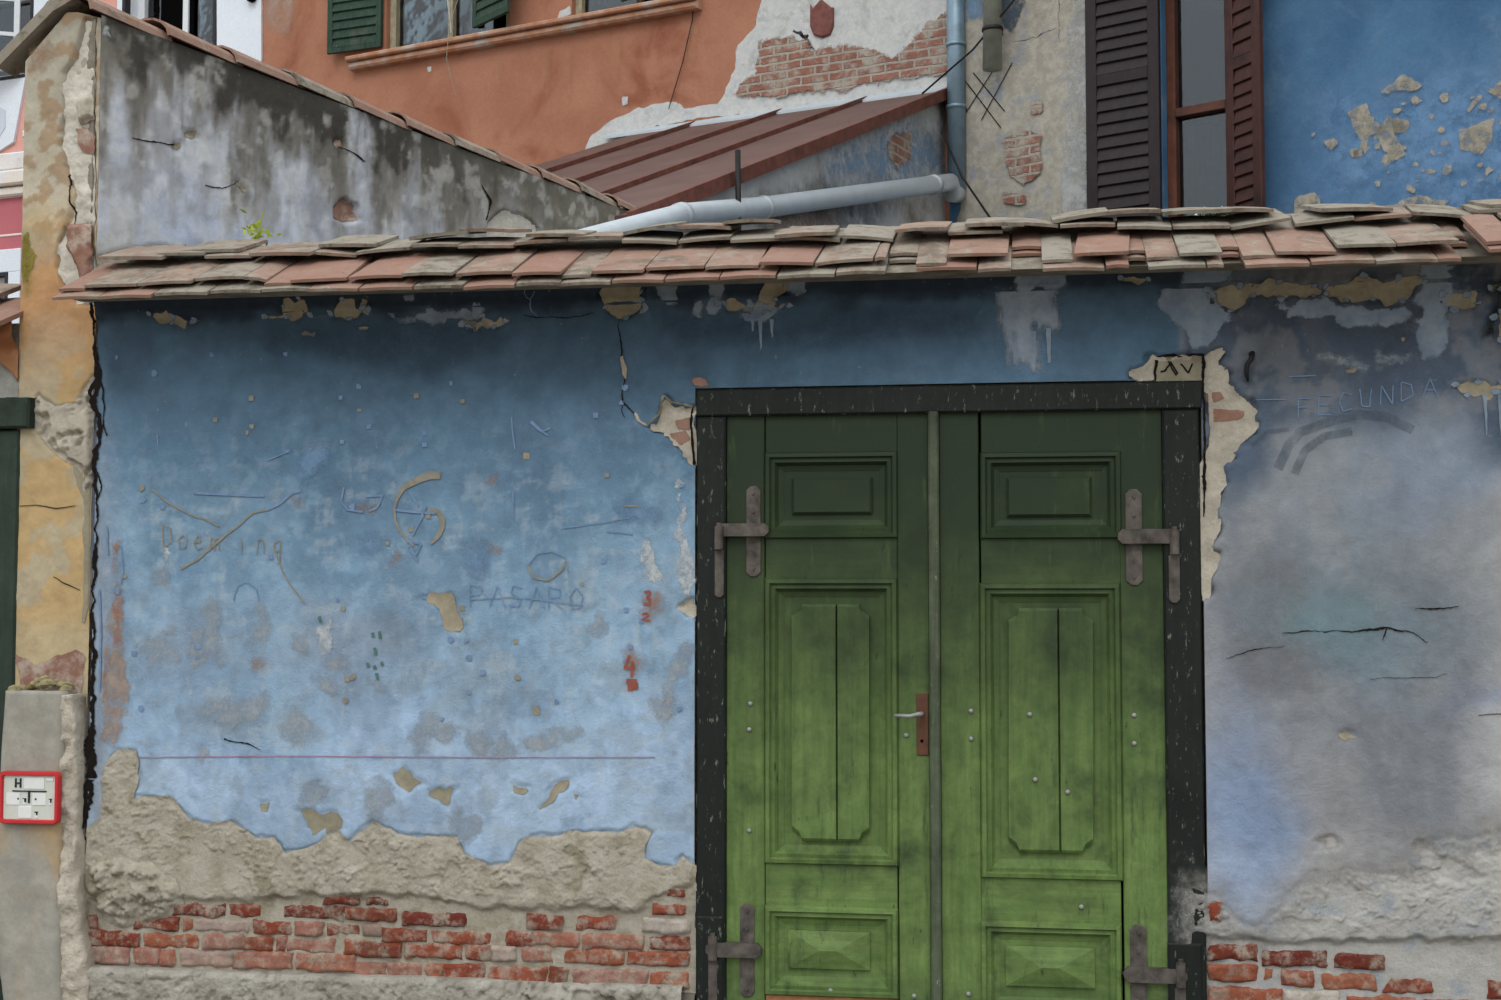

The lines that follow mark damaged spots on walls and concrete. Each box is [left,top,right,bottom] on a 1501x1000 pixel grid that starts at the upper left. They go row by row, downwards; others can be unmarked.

spalling [56,20,125,285]
flaking render [585,0,947,149]
flaking render [888,131,912,169]
flaking render [957,0,1087,223]
peeling [1311,74,1501,210]
spalling [1202,264,1501,343]
spalling [647,395,697,466]
spalling [691,377,709,387]
spalling [1450,379,1501,436]
crack [1228,606,1459,680]
spalling [15,650,697,1000]
spalling [1186,824,1501,1000]